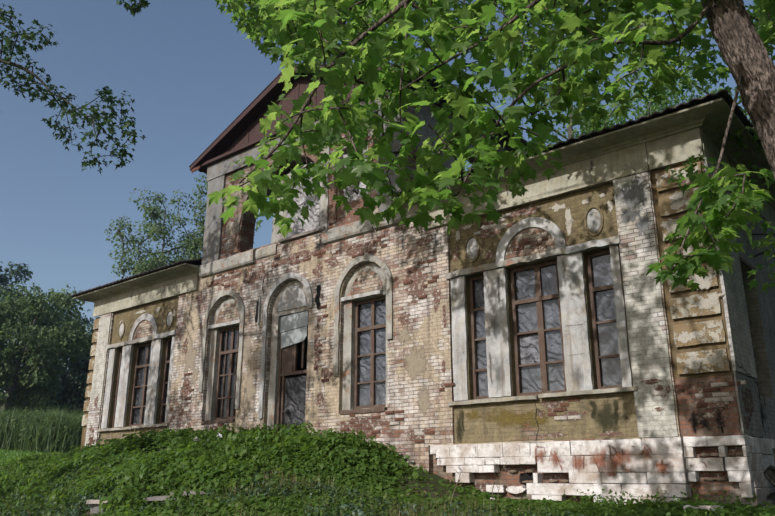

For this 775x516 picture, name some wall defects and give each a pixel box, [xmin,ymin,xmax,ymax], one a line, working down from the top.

peeling [453,203,574,262]
peeling [195,270,234,307]
peeling [683,265,724,310]
peeling [397,258,446,380]
peeling [674,324,718,343]
peeling [173,310,199,411]
peeling [683,352,703,374]
damp [589,400,619,432]
peeling [640,379,754,430]
spalling [409,428,435,443]
rust [535,446,562,469]
rust [573,445,652,475]